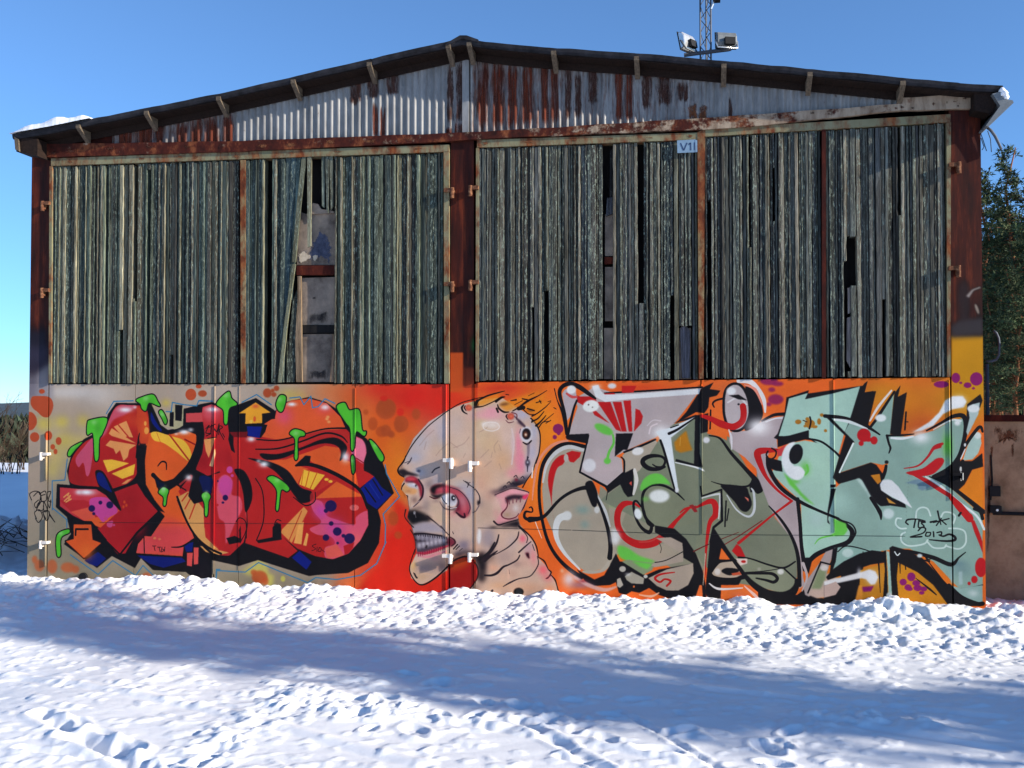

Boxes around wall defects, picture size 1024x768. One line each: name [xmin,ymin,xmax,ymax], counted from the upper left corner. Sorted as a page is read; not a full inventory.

corrosion [446,63,462,133]
corrosion [477,65,598,128]
corrosion [615,74,707,121]
corrosion [176,117,234,142]
peeling [299,228,332,264]